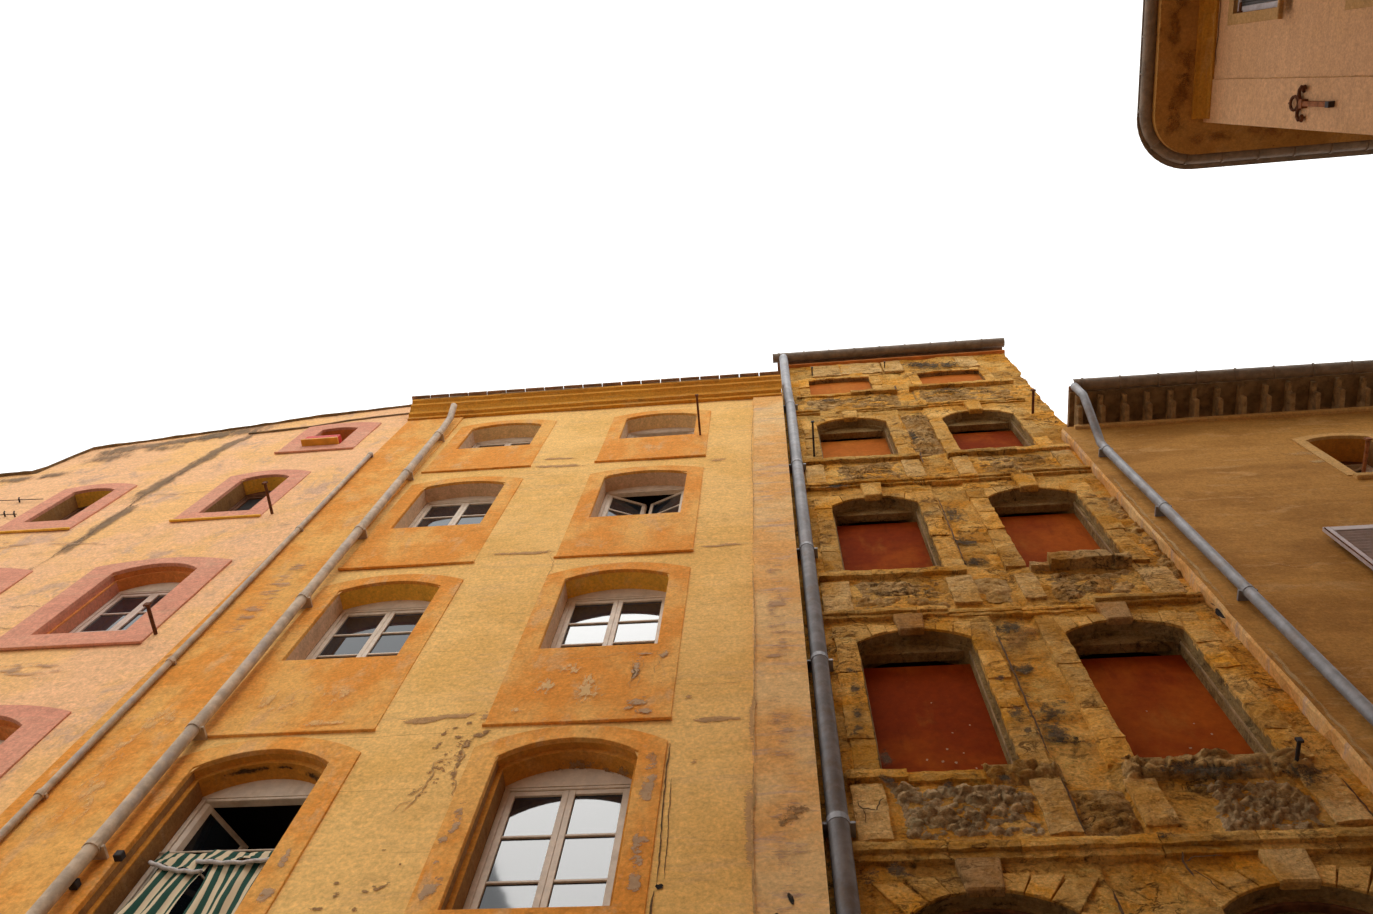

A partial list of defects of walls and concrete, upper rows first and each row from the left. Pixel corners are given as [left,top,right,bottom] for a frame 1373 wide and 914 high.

leakage [1,472,64,482]
leakage [60,427,261,552]
peeling [401,712,490,797]